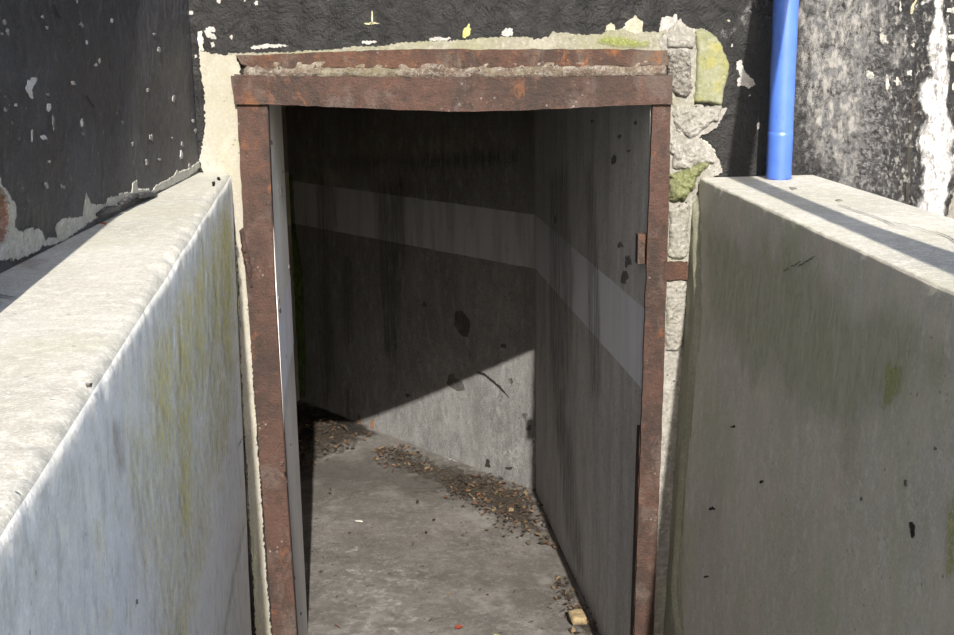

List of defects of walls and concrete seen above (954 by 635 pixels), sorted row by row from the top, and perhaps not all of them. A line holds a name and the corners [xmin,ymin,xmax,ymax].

leakage [117,200,240,635]
corrosion [239,228,253,288]
flaking render [0,14,727,635]
peeling [866,70,912,90]